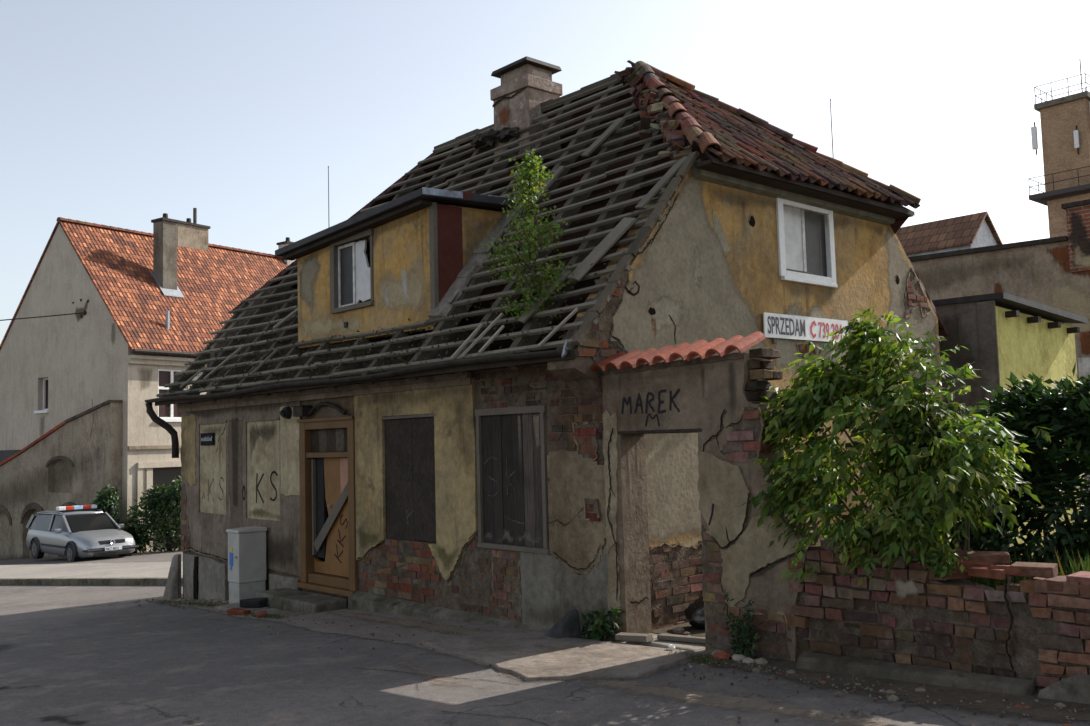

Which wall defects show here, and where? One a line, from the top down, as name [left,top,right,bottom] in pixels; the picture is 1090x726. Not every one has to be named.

peeling [1047,285,1090,355]
flaking render [475,365,605,465]
crack [702,409,742,452]
flaking render [362,540,444,602]
flaking render [487,532,535,618]
crack [548,428,650,615]
peeling [645,433,791,661]
crack [712,493,751,550]